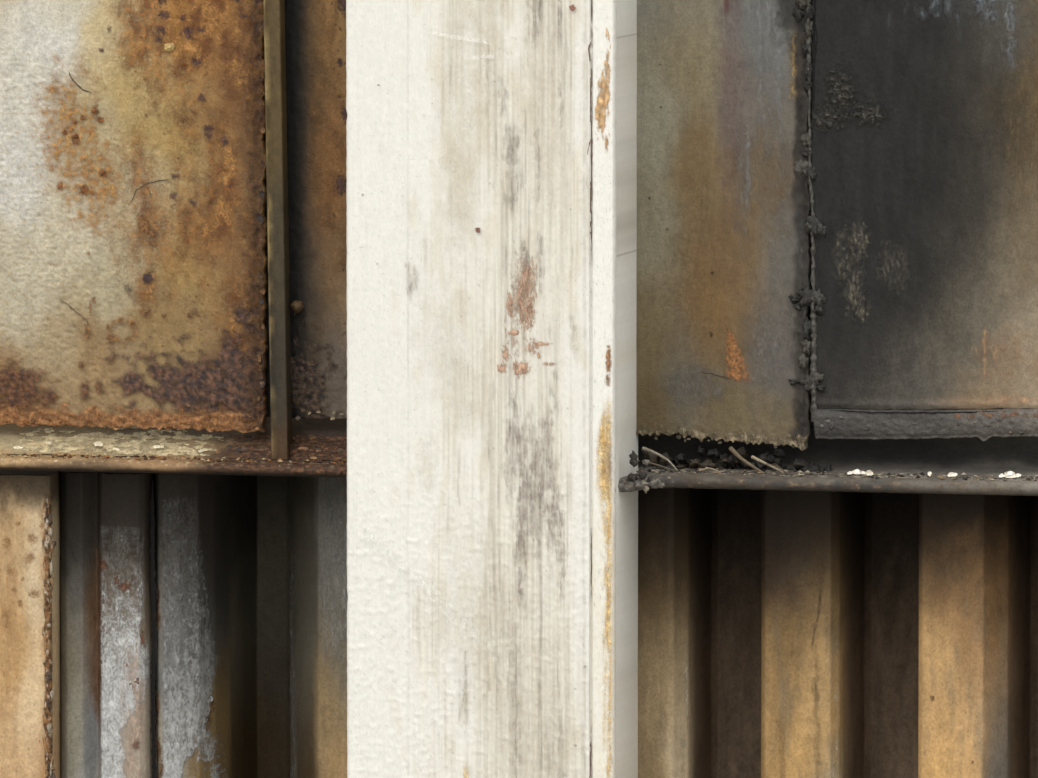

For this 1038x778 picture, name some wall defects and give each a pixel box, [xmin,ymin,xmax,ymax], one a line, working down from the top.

rust [0,0,347,474]
rust [726,333,750,381]
peeling [100,591,150,778]
peeling [162,569,226,778]